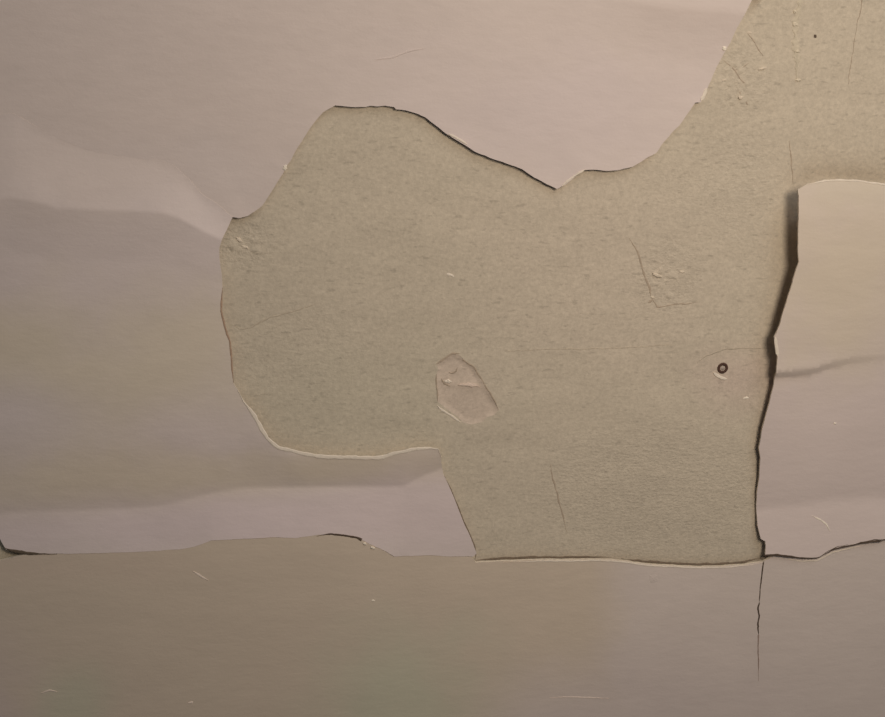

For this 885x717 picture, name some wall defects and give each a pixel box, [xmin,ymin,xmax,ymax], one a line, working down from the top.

peeling [219,0,885,569]
peeling [0,540,20,559]
crack [757,539,885,681]